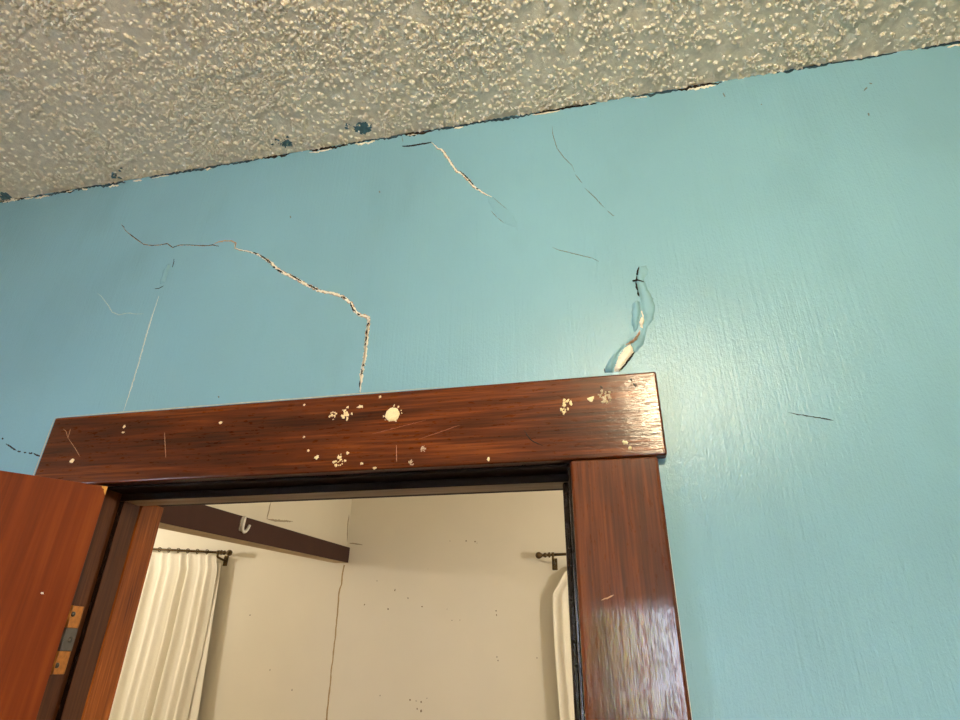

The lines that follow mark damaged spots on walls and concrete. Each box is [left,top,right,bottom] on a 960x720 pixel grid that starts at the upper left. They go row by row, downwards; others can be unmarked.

crack [631,82,722,98]
crack [777,52,897,73]
crack [922,41,960,49]
crack [0,103,614,223]
crack [100,224,370,409]
peeling [604,265,655,373]